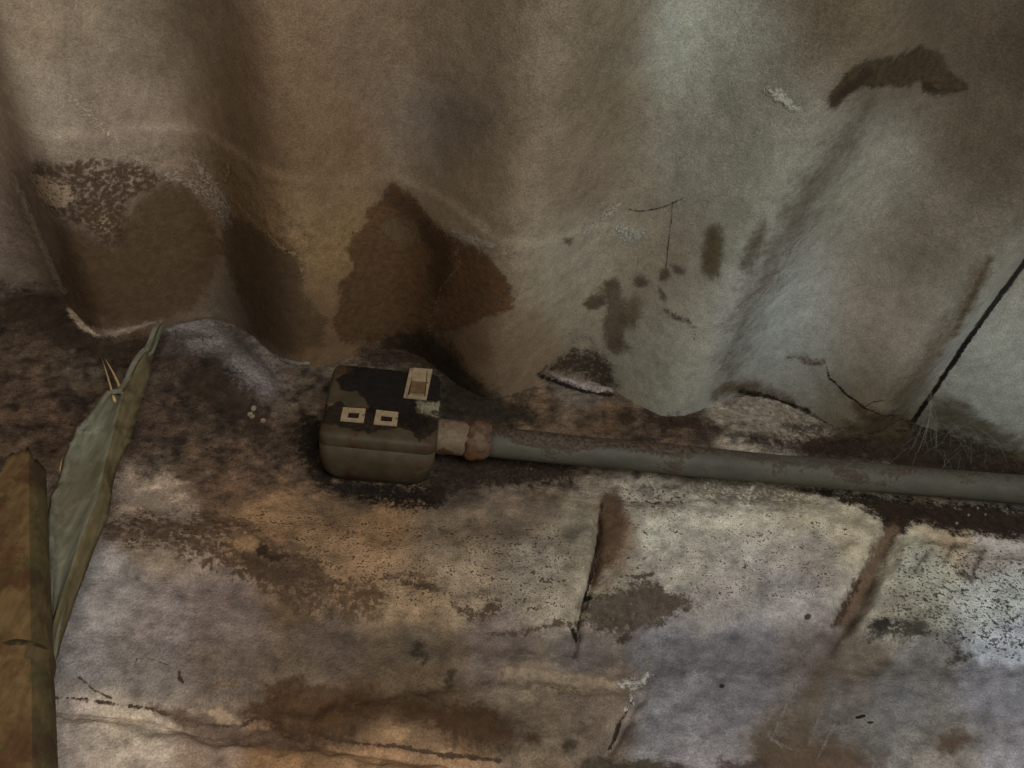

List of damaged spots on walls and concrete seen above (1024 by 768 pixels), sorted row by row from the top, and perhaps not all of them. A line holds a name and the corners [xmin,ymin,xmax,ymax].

leakage [829,44,969,107]
leakage [9,170,515,366]
crack [629,198,683,269]
leakage [703,225,725,277]
peeling [538,265,695,397]
crack [787,356,895,422]
leakage [291,413,577,513]
crack [571,487,630,642]